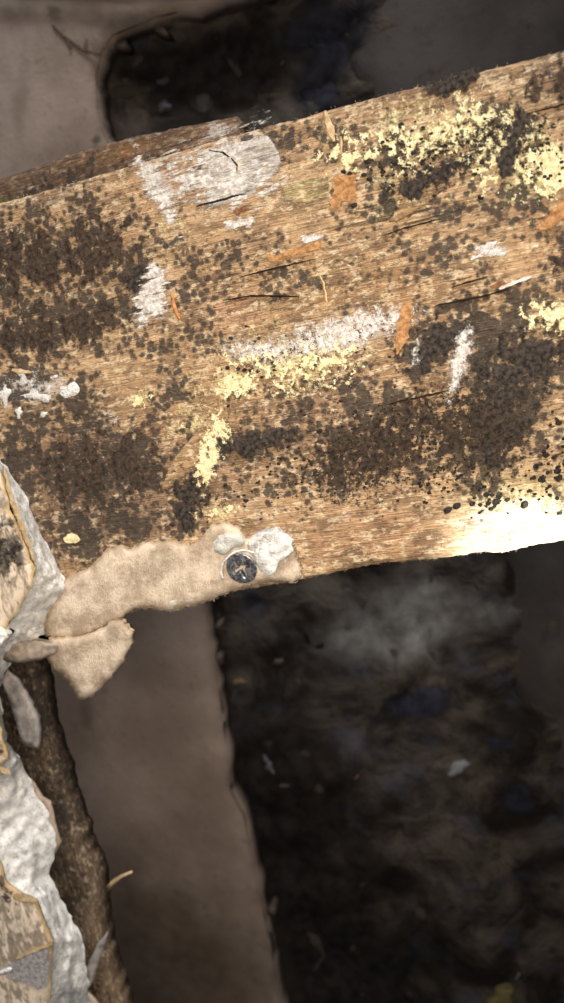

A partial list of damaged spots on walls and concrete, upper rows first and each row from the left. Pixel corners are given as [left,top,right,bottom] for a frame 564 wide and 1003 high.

damp [311,54,564,210]
damp [0,208,168,361]
damp [544,230,564,273]
damp [4,297,564,534]
damp [0,521,22,569]